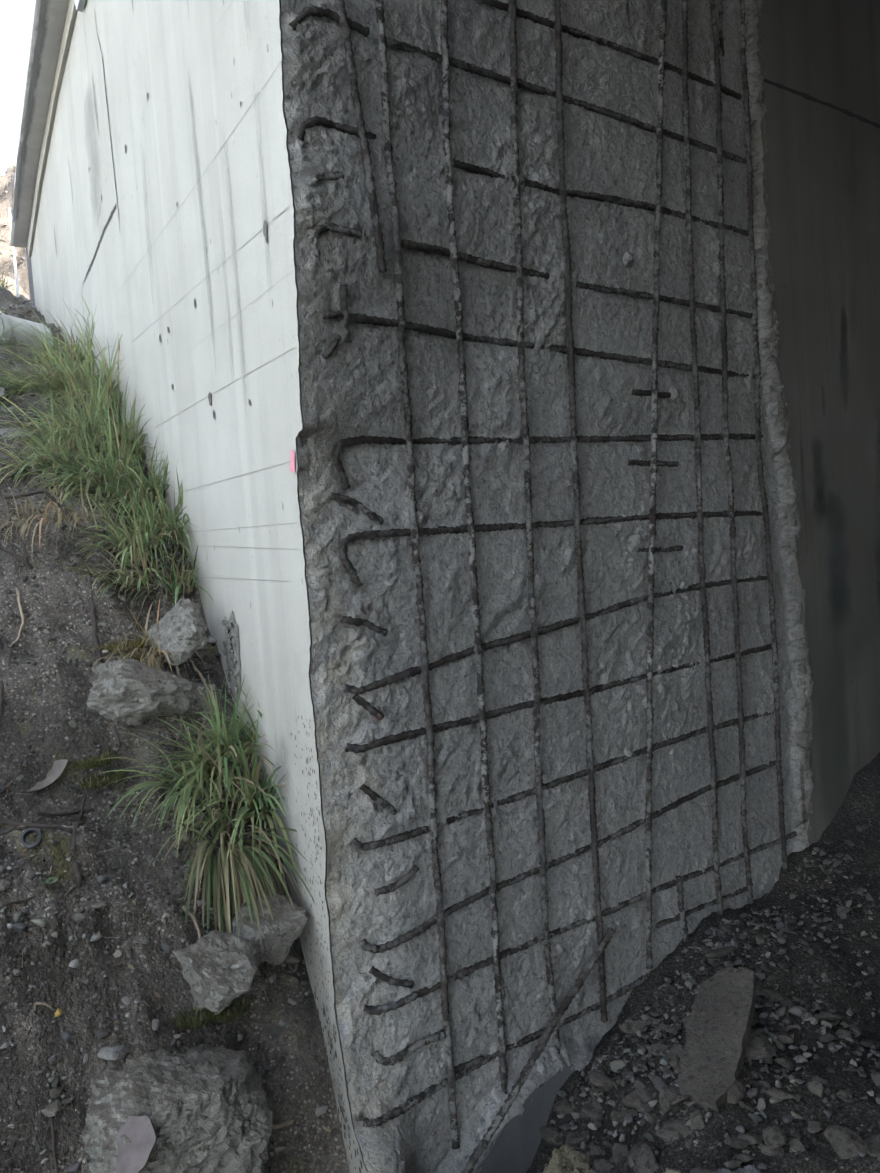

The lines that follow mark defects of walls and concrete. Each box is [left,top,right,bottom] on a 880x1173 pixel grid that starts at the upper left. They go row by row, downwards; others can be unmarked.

spalling [281,0,815,1173]